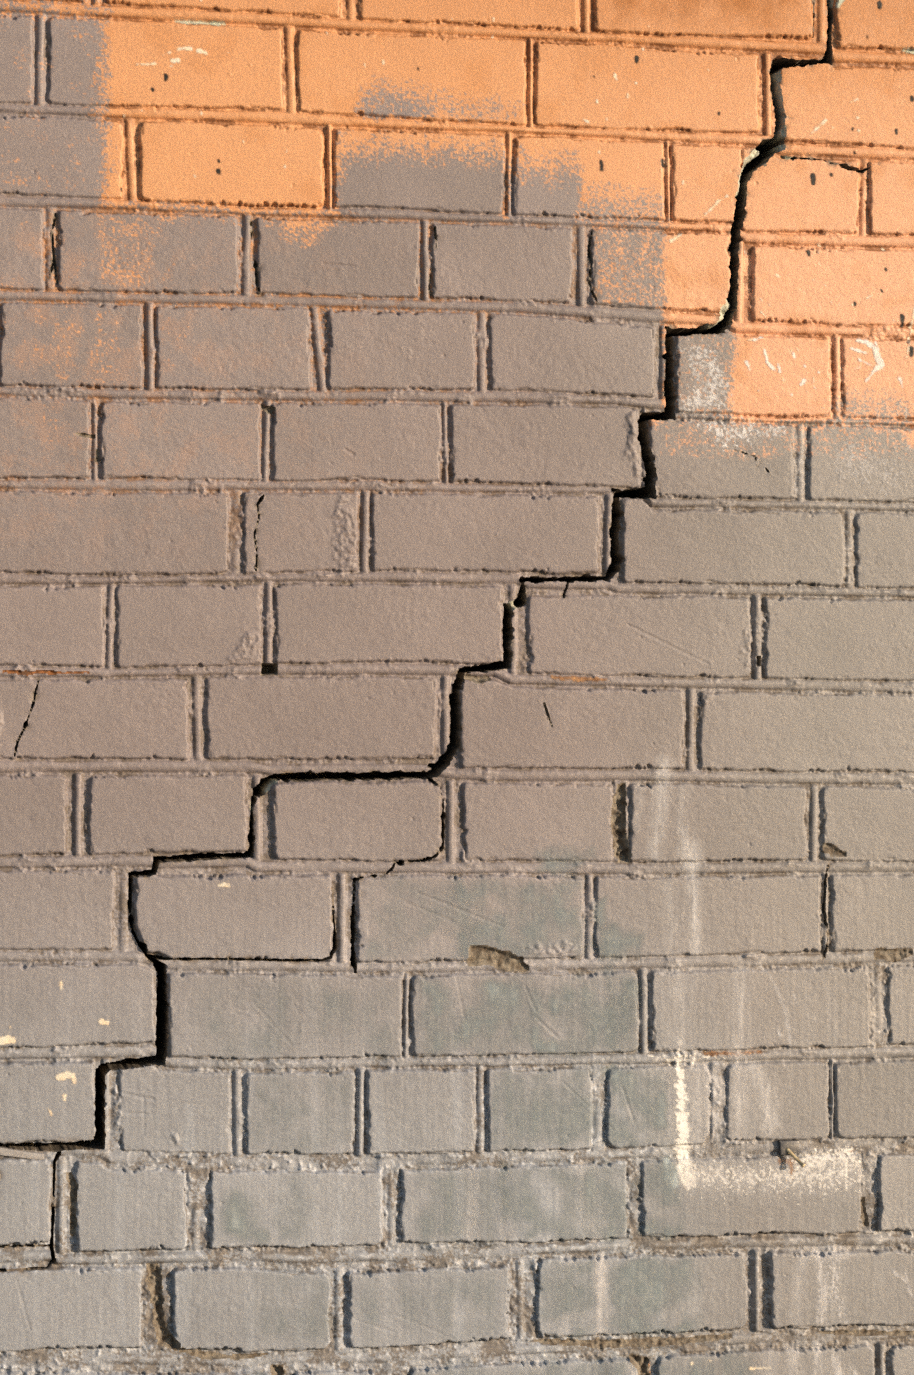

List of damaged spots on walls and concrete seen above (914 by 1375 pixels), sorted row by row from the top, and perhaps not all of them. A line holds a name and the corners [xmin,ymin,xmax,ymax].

crack [780,155,871,173]
crack [49,213,59,284]
crack [249,221,261,294]
crack [252,0,834,797]
crack [14,678,40,757]
crack [350,800,446,974]
crack [821,864,829,958]
crack [0,796,337,1272]